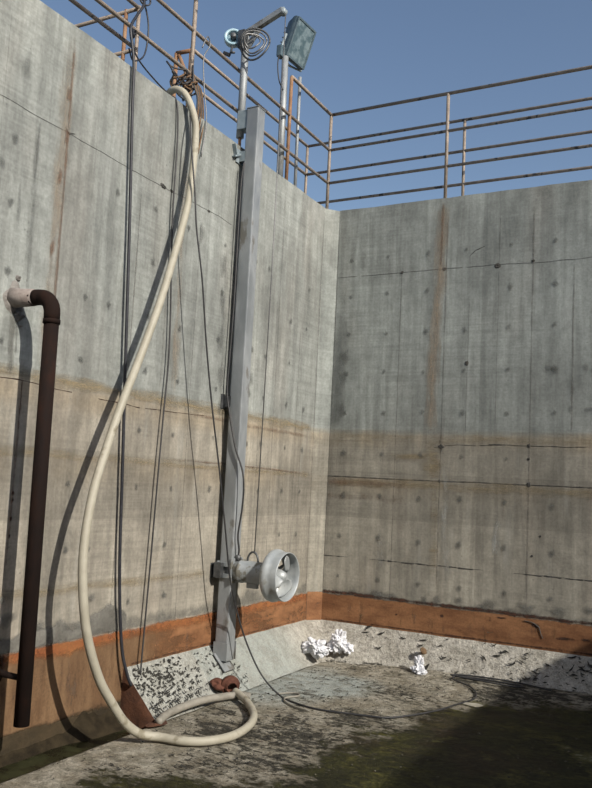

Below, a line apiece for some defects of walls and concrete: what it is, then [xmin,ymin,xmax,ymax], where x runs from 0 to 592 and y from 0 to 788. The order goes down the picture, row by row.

rust [235,590,592,657]
rust [0,611,217,737]
leakage [0,701,121,756]